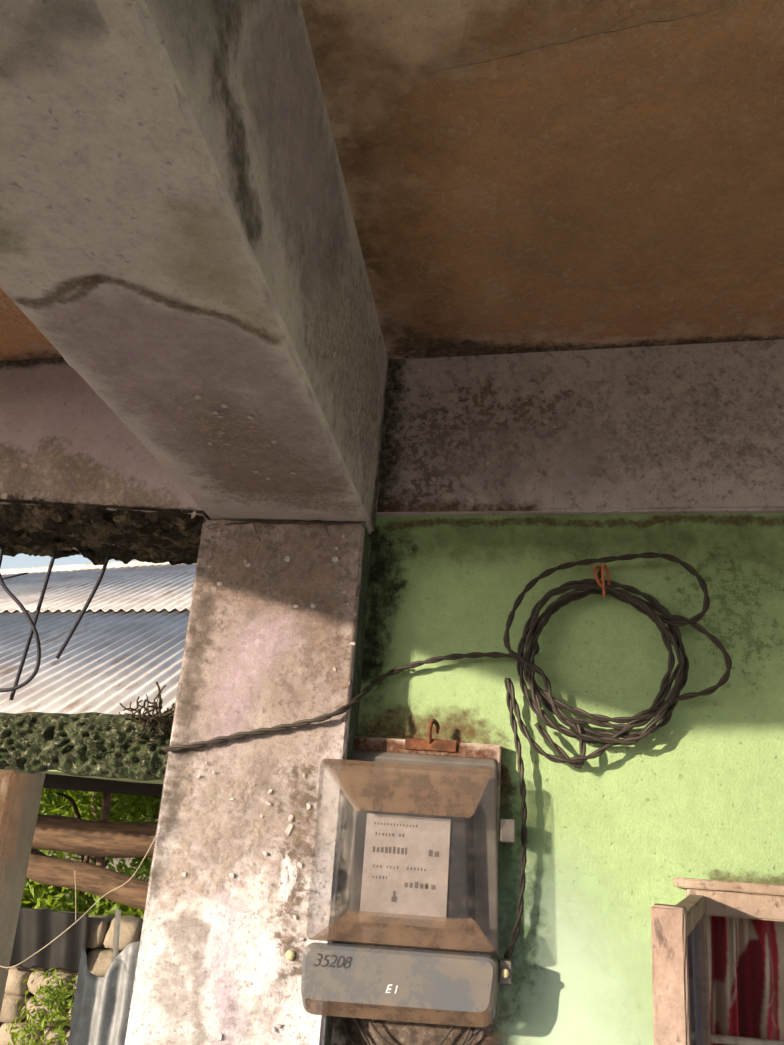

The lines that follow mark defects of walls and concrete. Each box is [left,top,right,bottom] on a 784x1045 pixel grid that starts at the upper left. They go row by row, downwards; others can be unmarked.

leakage [175,0,261,239]
leakage [249,0,784,358]
crack [430,7,723,74]
spalling [0,437,211,700]
leakage [347,526,417,760]
leakage [325,1016,333,1045]
leakage [335,795,347,921]
leakage [498,811,633,1045]